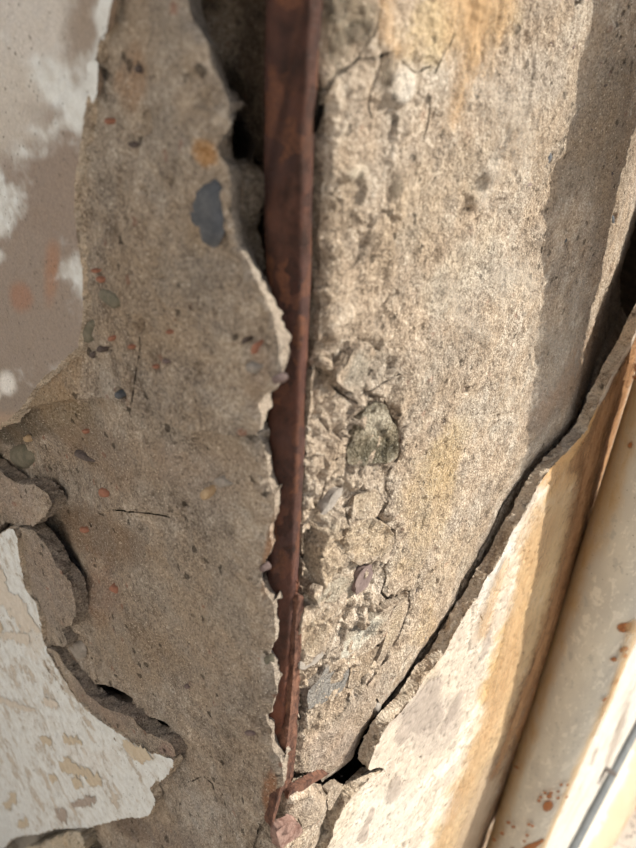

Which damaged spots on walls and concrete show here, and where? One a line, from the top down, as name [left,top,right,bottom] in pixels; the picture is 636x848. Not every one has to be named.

crack [315,96,324,133]
spalling [0,0,291,848]
corrosion [453,339,636,848]
crack [320,644,428,786]
peeling [270,814,303,848]
damp [457,749,510,848]